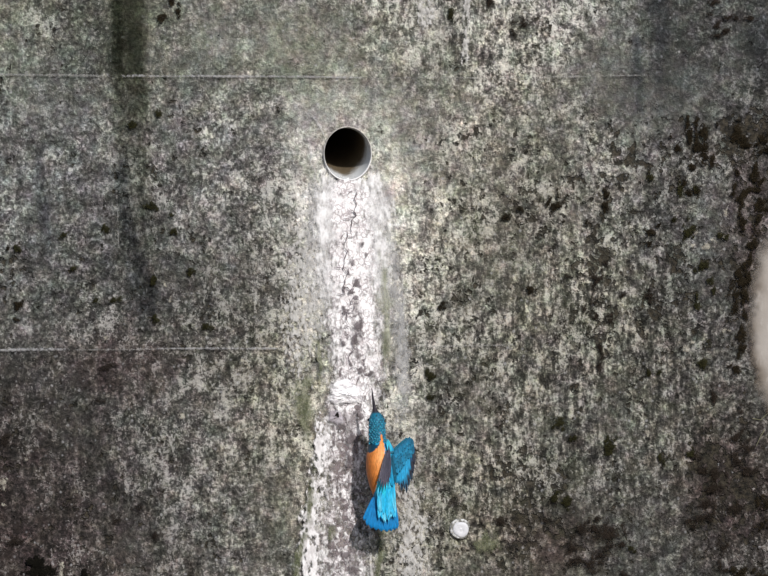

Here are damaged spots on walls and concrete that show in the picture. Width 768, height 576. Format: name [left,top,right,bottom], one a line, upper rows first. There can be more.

efflorescence [416,0,435,30]
efflorescence [461,0,470,64]
crack [336,190,363,370]
leakage [280,170,397,576]
leakage [393,459,436,576]